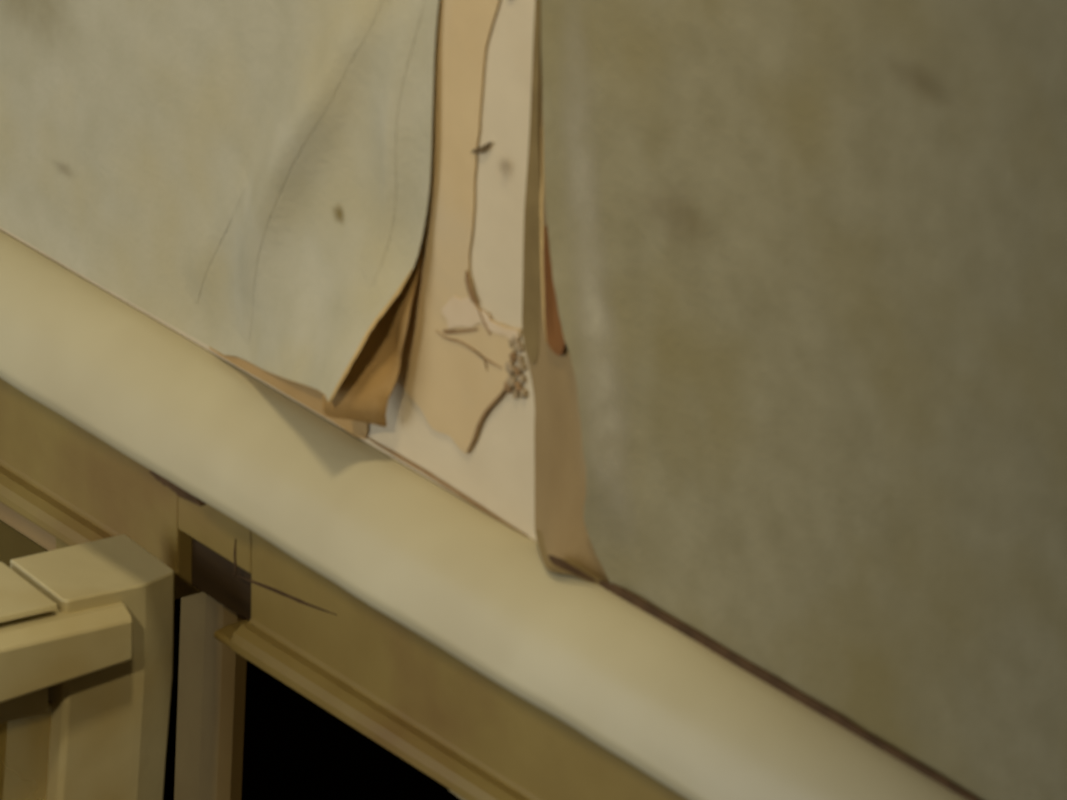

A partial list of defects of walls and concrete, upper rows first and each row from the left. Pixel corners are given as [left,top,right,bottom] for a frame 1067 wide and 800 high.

peeling [396,0,526,454]